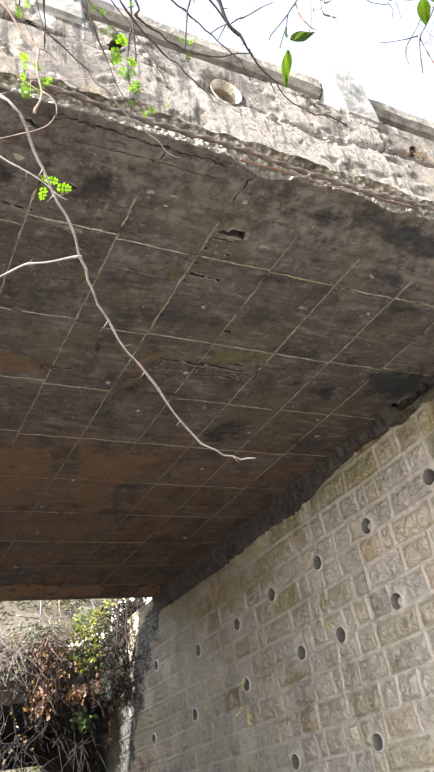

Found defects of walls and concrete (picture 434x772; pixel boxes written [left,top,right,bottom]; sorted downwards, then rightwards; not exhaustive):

crack [1,86,255,204]
spalling [0,72,434,220]
spalling [213,229,246,243]
water stain [371,219,434,258]
water stain [366,369,422,400]